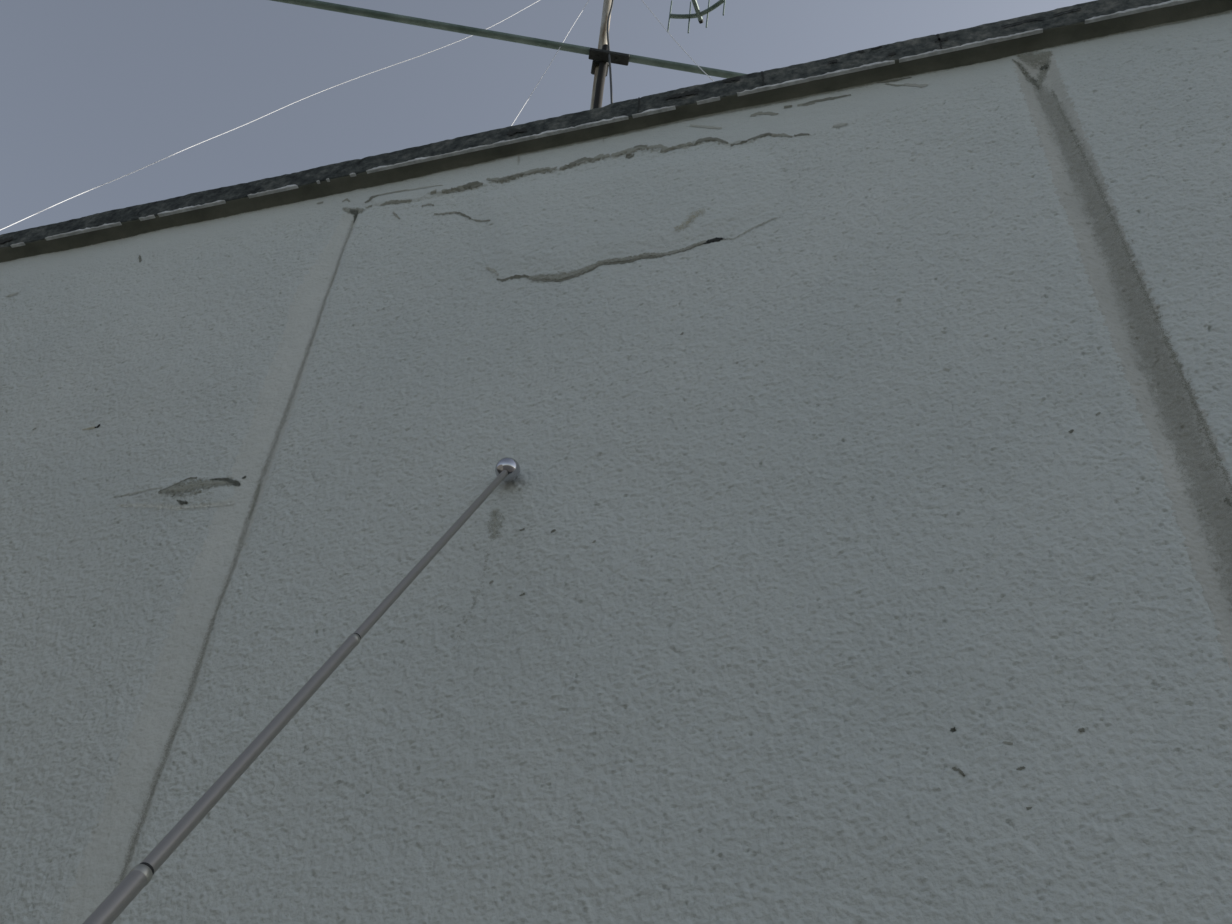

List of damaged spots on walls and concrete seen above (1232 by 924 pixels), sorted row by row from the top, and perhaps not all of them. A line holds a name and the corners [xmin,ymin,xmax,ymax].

crack [885,81,928,89]
crack [317,71,851,222]
crack [486,217,780,282]
leakage [1014,50,1232,613]
spalling [160,475,246,505]